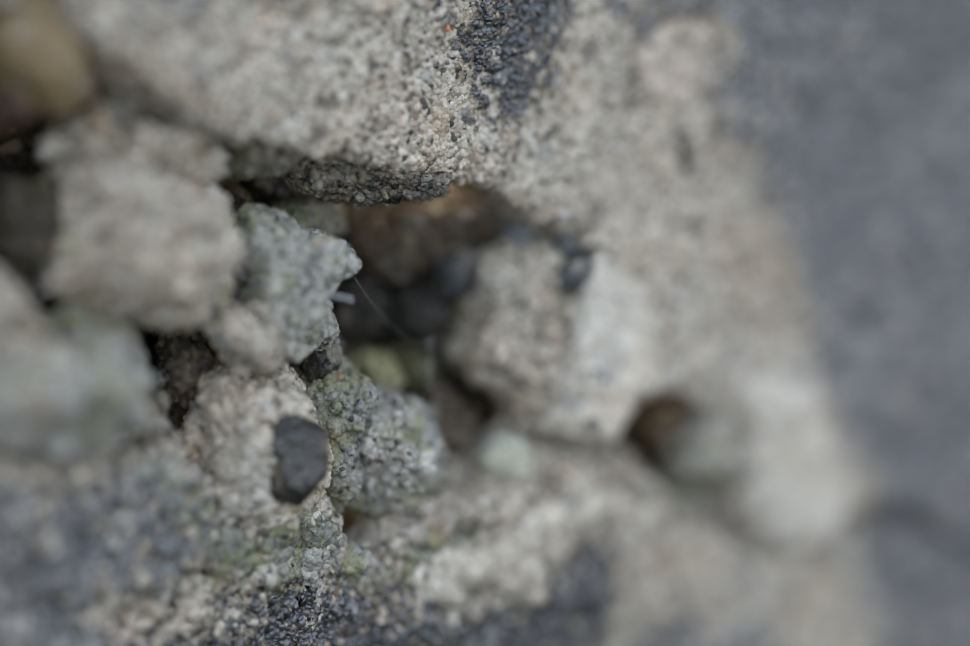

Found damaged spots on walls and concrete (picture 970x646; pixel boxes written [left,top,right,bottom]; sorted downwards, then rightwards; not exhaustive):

peeling [631,4,717,108]
spalling [0,121,54,190]
spalling [93,75,465,248]
spalling [28,288,64,316]
spalling [136,324,189,433]
spalling [339,300,504,437]
spalling [614,395,704,499]
spalling [341,507,361,534]